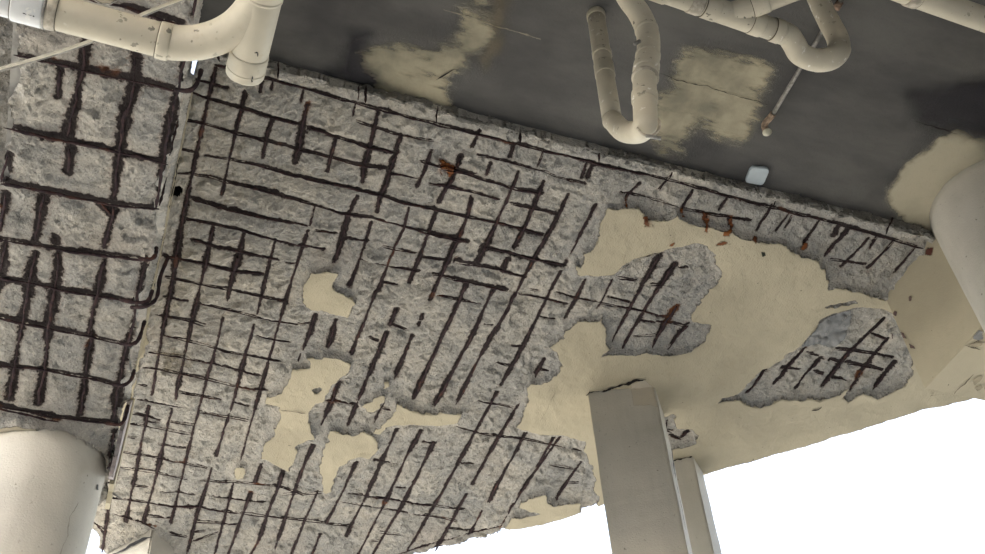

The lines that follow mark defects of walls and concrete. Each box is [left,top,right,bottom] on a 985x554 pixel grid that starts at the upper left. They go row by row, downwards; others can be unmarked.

spalling [0,16,88,67]
spalling [82,0,203,25]
peeling [360,8,497,107]
spalling [0,41,204,505]
rust [439,159,455,177]
spalling [92,47,935,554]
rust [717,215,734,246]
peeling [835,129,985,237]